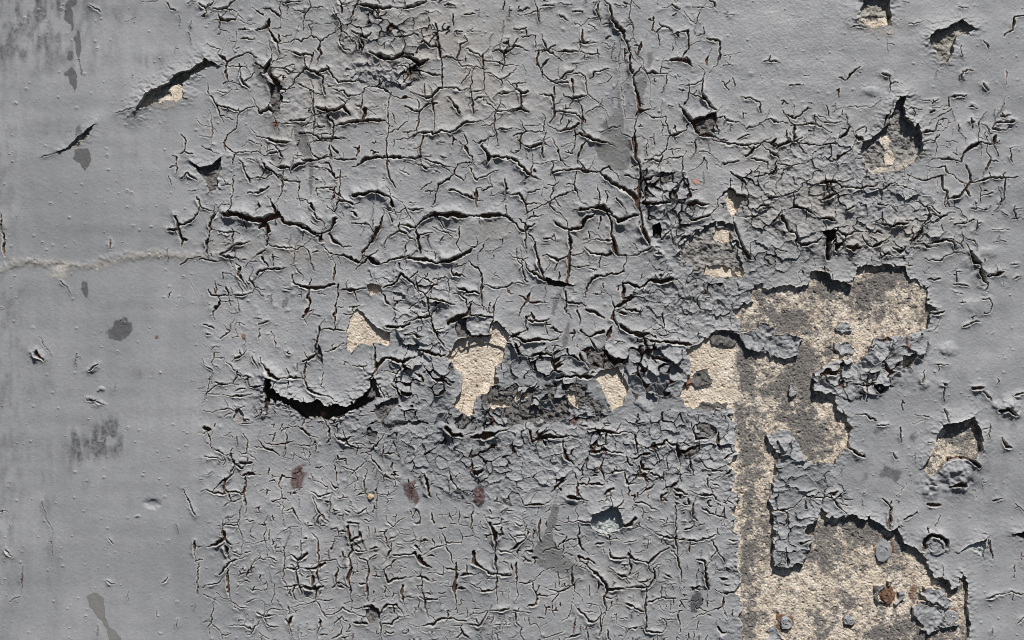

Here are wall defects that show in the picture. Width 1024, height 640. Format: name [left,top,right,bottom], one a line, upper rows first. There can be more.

spalling [137,60,216,111]
spalling [858,0,893,28]
spalling [929,19,974,62]
crack [959,44,975,82]
crack [981,15,1024,51]
crack [725,70,1024,332]
crack [166,0,901,640]
crack [30,337,117,407]
spalling [264,97,971,640]
crack [773,363,1024,578]
spalling [922,417,984,476]
crack [968,532,1024,640]